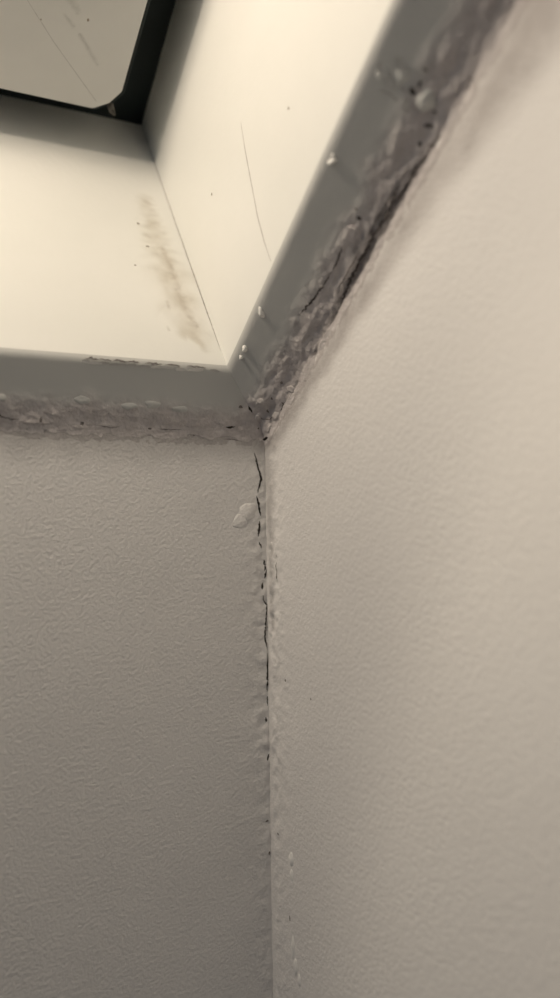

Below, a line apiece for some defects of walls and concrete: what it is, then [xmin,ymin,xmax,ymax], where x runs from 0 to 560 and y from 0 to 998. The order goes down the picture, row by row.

crack [299,136,439,324]
crack [226,381,295,722]